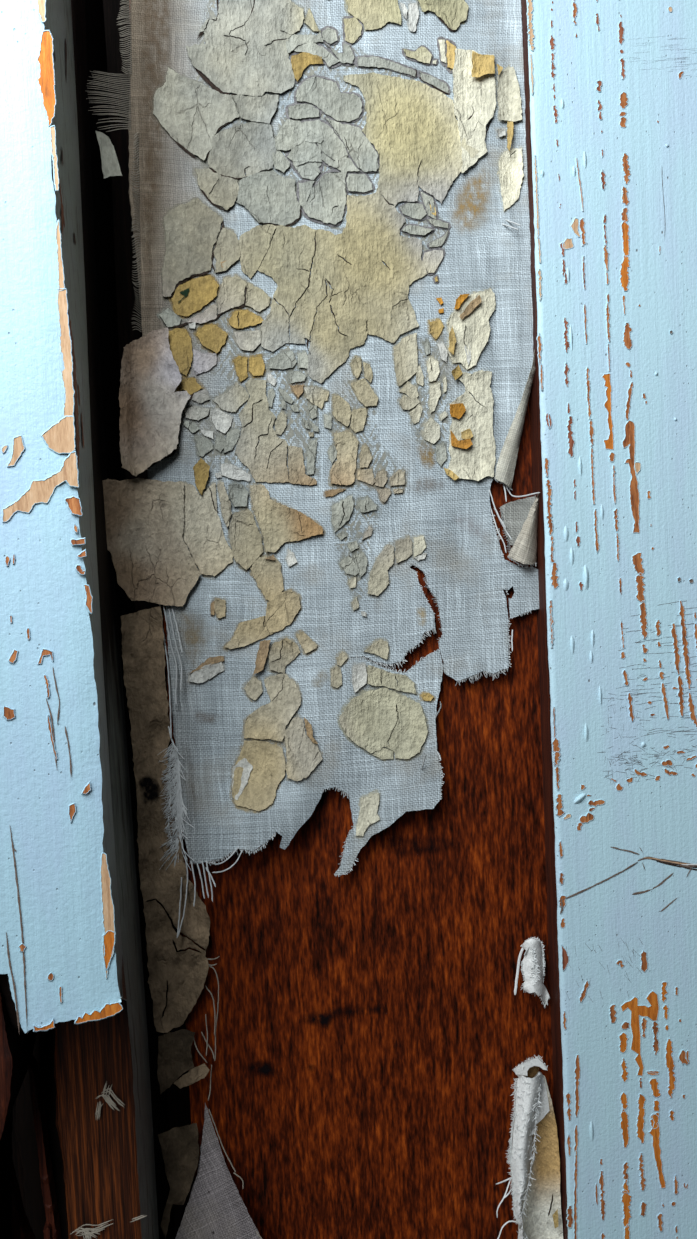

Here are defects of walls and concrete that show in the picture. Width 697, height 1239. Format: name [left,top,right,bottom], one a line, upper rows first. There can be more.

crack [162,0,406,352]
crack [415,70,492,137]
peeling [618,0,628,128]
peeling [1,0,93,614]
crack [135,435,180,477]
crack [241,403,289,479]
peeling [102,0,559,811]
peeling [545,153,697,728]
peeling [551,707,605,831]
peeling [74,852,127,1024]
peeling [565,1054,581,1239]
peeling [609,981,690,1239]